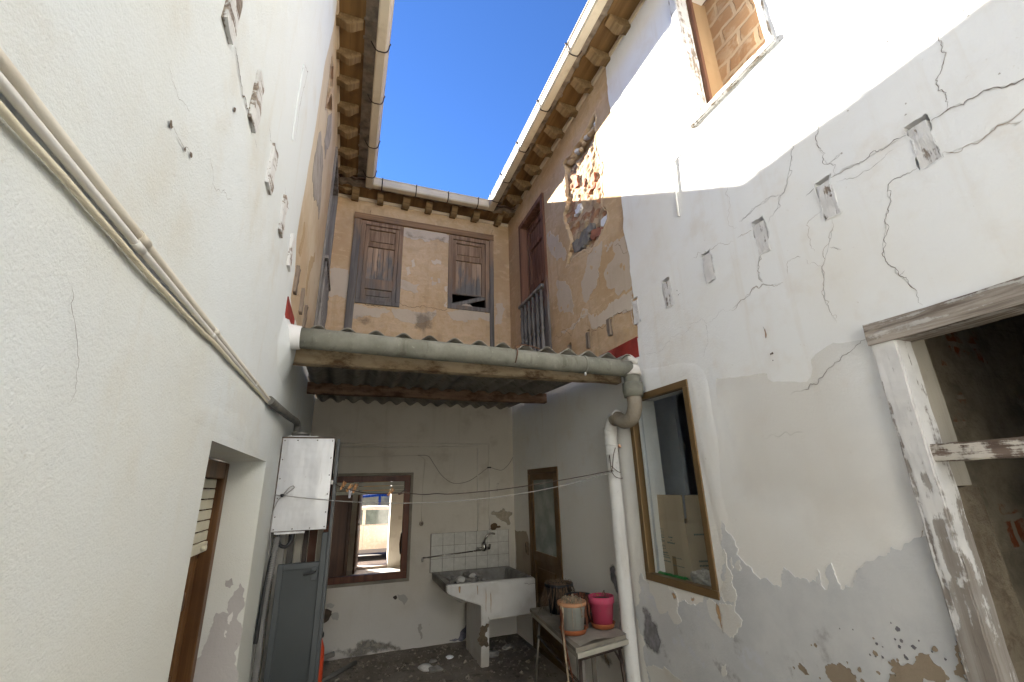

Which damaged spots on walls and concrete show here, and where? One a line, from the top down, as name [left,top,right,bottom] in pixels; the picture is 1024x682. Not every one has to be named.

crack [931,1,1024,121]
spalling [546,111,640,334]
crack [694,62,919,318]
crack [948,109,1024,153]
peeling [193,578,245,682]
peeling [490,509,531,575]
peeling [635,522,968,682]